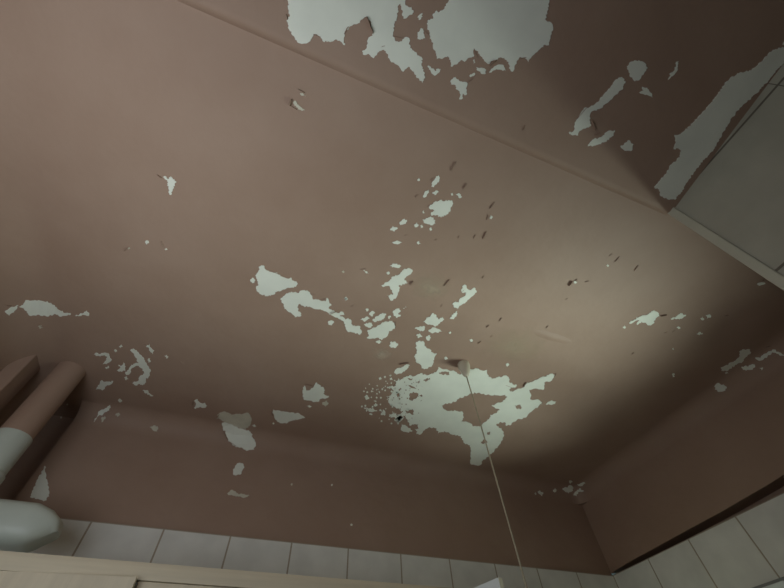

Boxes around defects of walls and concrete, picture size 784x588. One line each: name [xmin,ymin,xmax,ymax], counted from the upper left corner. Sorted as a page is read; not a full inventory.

peeling [286,0,553,99]
peeling [569,60,652,146]
peeling [654,42,784,200]
peeling [157,175,176,195]
peeling [390,175,467,244]
peeling [5,300,89,329]
peeling [250,263,413,348]
peeling [623,311,686,333]
peeling [94,344,154,396]
peeling [302,382,329,408]
peeling [361,285,556,466]
peeling [216,411,256,451]